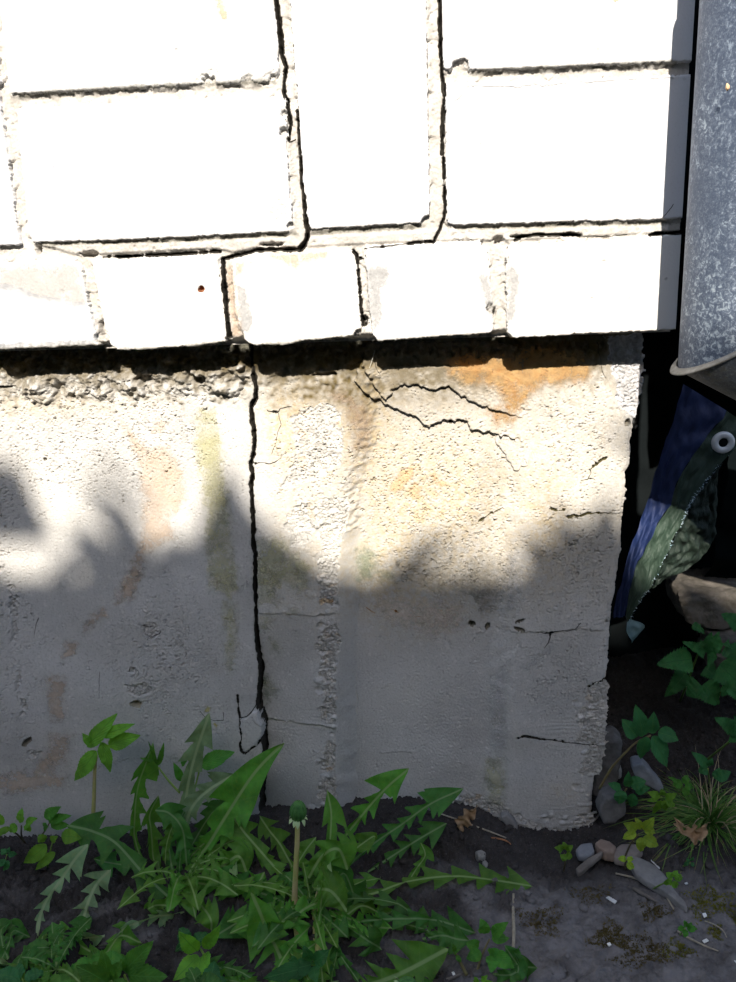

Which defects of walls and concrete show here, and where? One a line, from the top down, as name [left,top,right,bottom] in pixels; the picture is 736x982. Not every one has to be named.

crack [351,0,447,326]
crack [103,0,311,755]
rust [448,346,589,421]
spalling [279,402,345,489]
spalling [284,495,351,608]
spalling [314,623,342,724]
crack [538,623,581,647]
crack [259,776,267,811]
spalling [316,740,338,805]
crack [517,735,598,746]